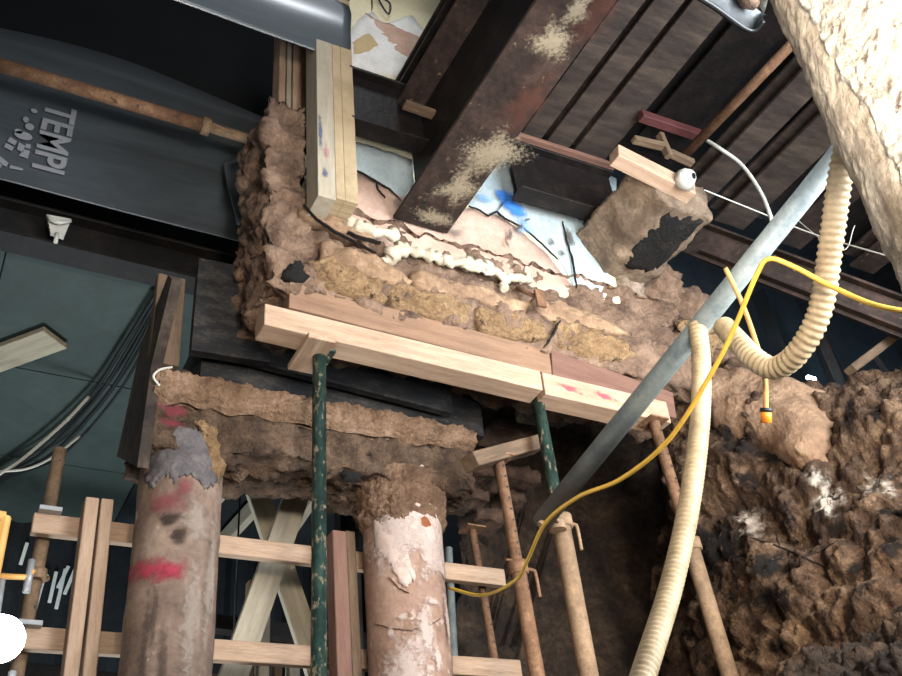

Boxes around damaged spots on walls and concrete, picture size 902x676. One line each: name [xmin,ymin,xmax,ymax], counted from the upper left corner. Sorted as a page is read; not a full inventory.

spalling [231,142,681,383]
spalling [663,354,692,407]
spalling [154,367,312,484]
spalling [326,385,536,452]
spalling [546,410,608,429]
spalling [627,429,652,444]
crack [374,618,441,631]
flaking render [383,598,450,676]